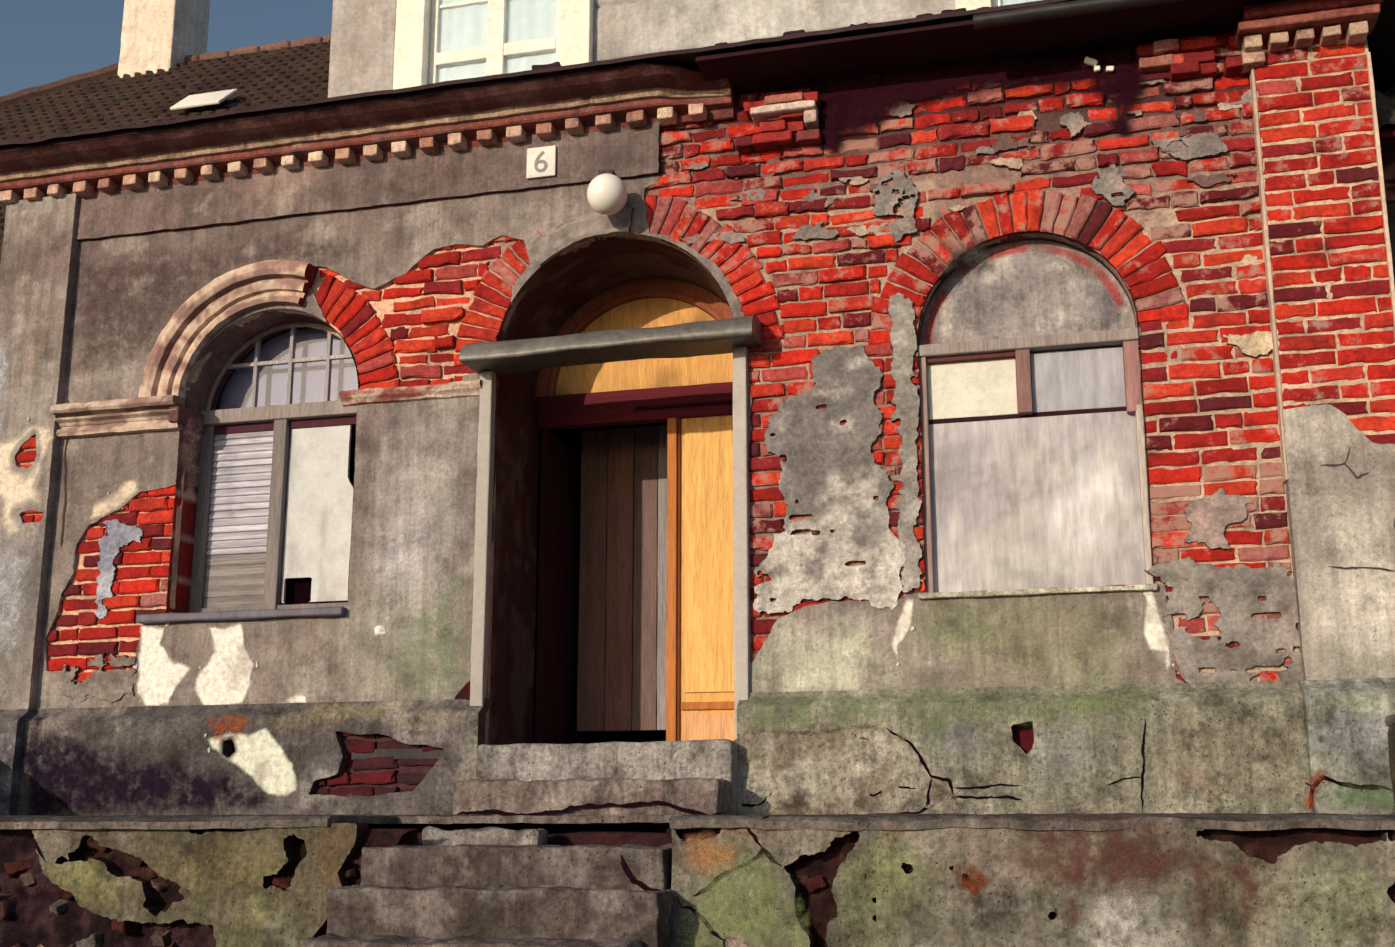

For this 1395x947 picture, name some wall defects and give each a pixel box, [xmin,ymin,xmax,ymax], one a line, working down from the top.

flaking render [310,230,541,389]
flaking render [640,30,1395,683]
peeling [0,417,54,535]
flaking render [45,481,258,706]
spalling [0,829,216,947]
spalling [263,833,307,890]
flaking render [204,729,444,797]
spalling [783,831,860,947]
crack [846,727,1022,814]
spalling [1196,830,1395,864]
crack [1304,775,1395,816]
spalling [1387,882,1395,903]